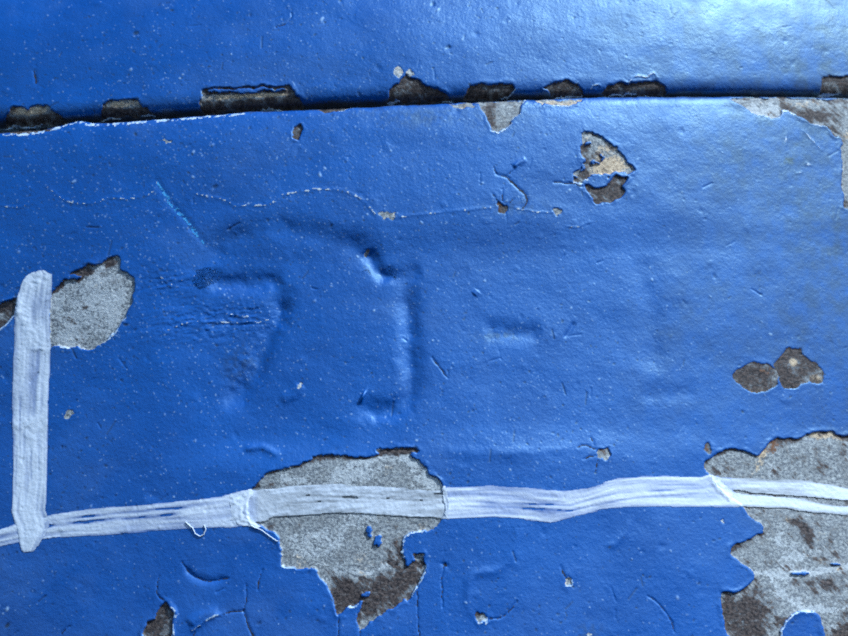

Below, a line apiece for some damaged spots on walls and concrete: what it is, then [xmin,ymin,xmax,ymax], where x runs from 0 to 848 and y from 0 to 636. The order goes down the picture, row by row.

peeling [3,85,305,136]
peeling [387,66,526,134]
peeling [536,79,584,107]
peeling [573,132,635,204]
peeling [601,81,667,97]
peeling [732,75,848,209]
peeling [50,256,135,350]
peeling [252,447,443,501]
peeling [704,431,848,488]
peeling [255,512,441,630]
peeling [721,490,848,636]
peeling [142,602,174,636]